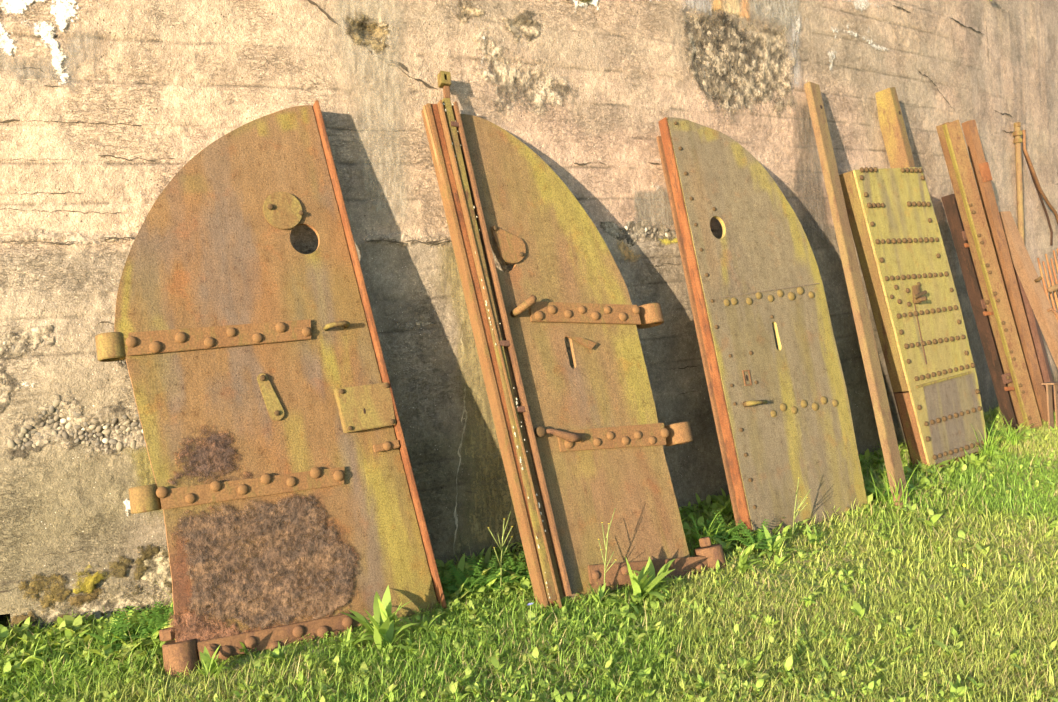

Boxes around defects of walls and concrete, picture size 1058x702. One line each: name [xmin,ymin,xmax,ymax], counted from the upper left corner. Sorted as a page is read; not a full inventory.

water stain [0,0,90,85]
crack [308,0,345,29]
spalling [346,12,391,52]
crack [951,18,989,59]
crack [365,45,438,90]
spalling [682,9,799,125]